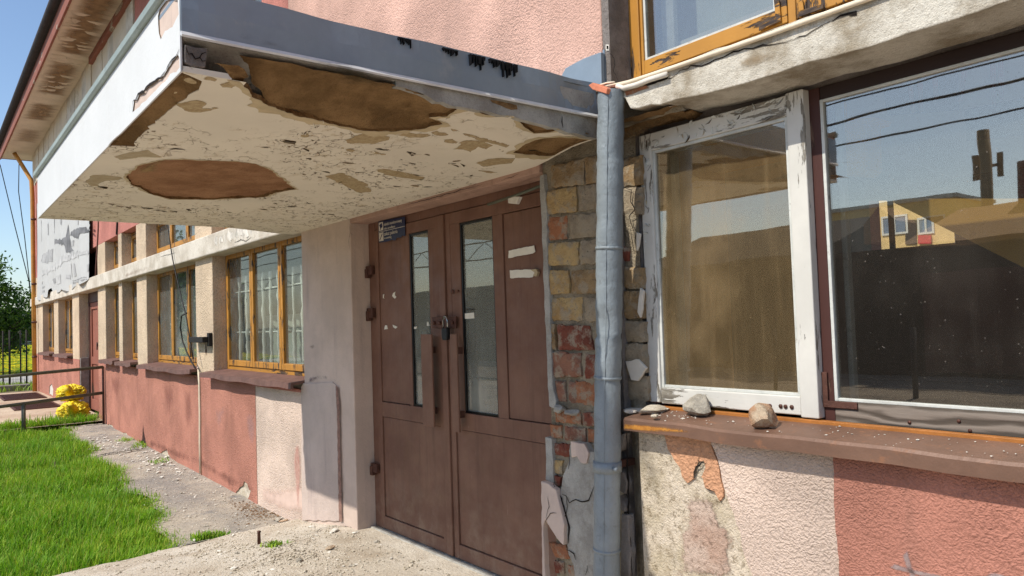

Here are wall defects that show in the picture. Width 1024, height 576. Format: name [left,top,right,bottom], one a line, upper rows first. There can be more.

leakage [31,0,113,119]
crack [129,50,179,112]
peeling [677,96,788,143]
flaking render [86,45,597,576]
crack [545,455,594,575]
flaking render [620,425,753,576]